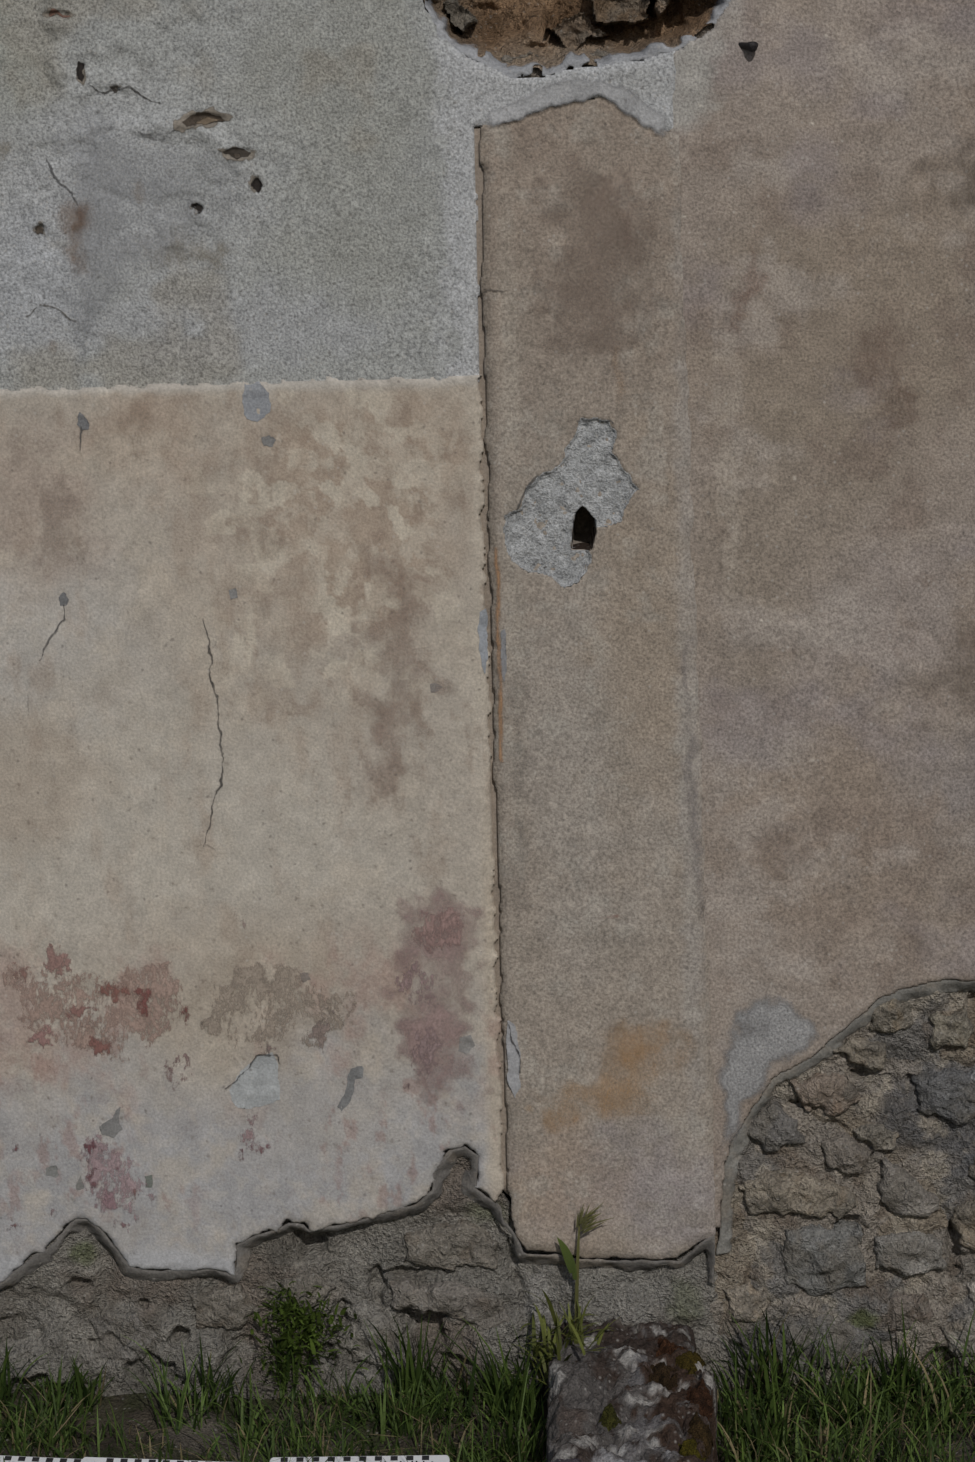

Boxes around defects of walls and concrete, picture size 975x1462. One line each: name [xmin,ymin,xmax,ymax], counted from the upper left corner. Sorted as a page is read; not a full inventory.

spalling [42,8,74,19]
spalling [76,61,86,85]
spalling [422,0,731,78]
spalling [503,417,639,588]
crack [203,622,224,843]
spalling [0,979,975,1404]